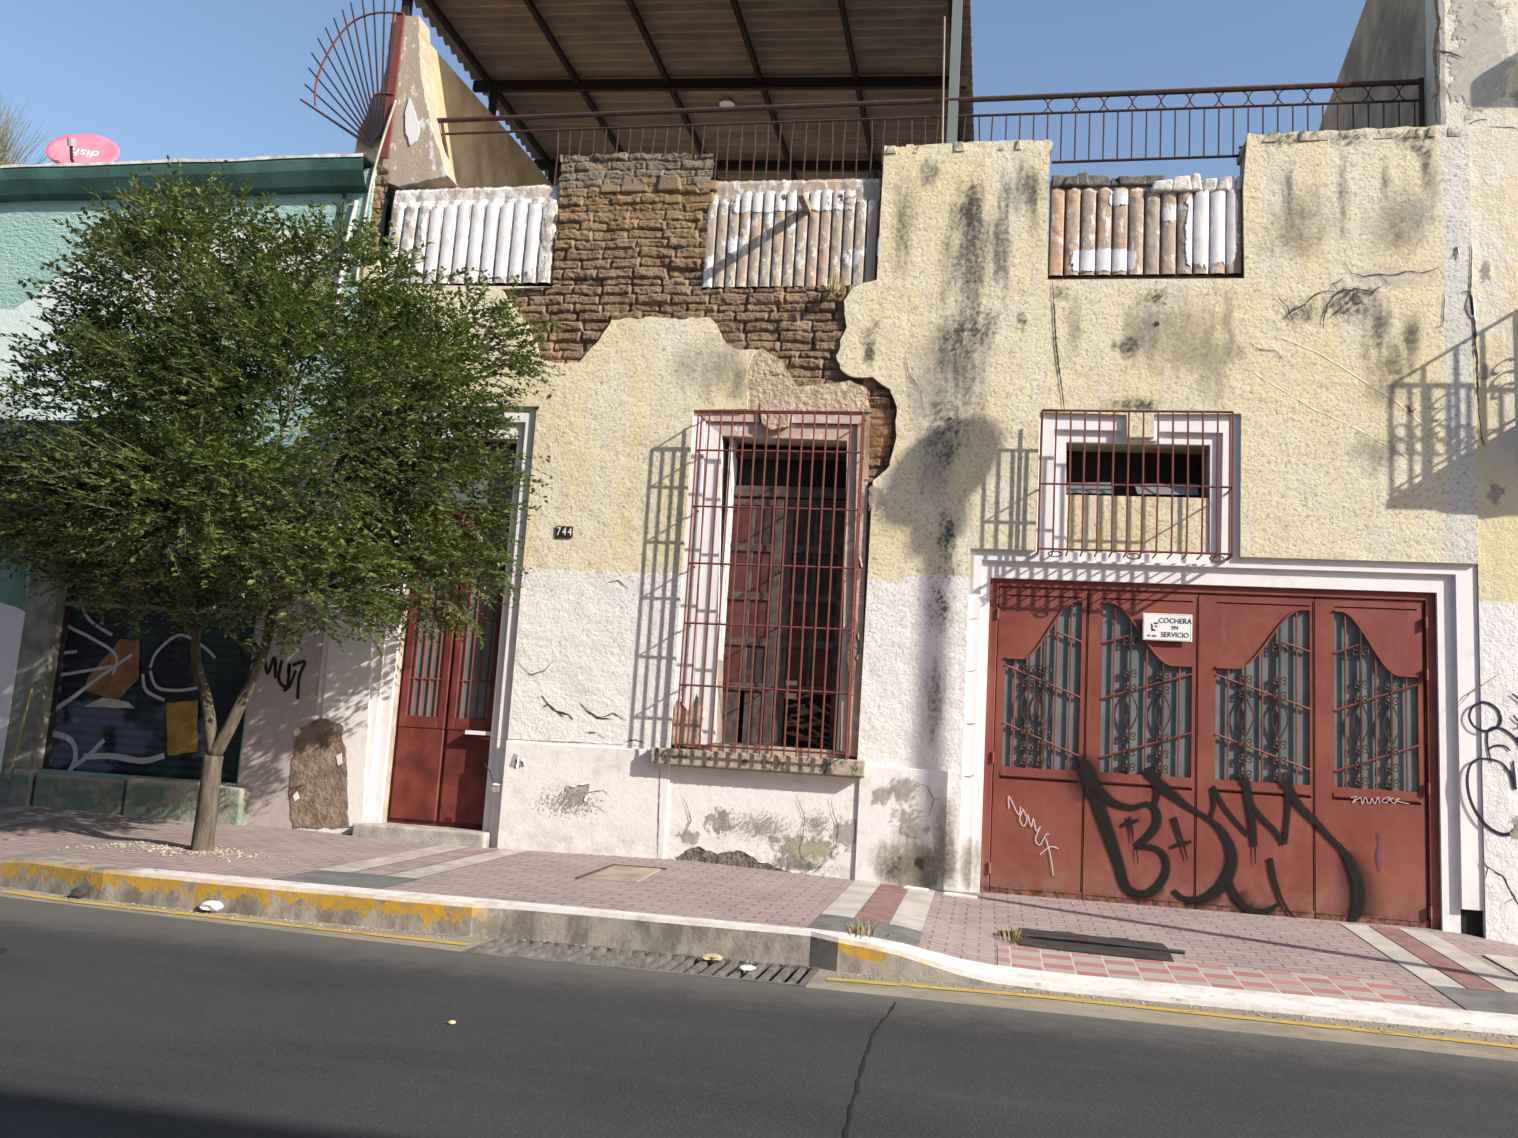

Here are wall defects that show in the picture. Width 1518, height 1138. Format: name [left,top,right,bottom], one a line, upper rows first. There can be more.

peeling [1448,0,1518,121]
leakage [1396,132,1430,174]
leakage [897,199,909,251]
spalling [411,152,897,516]
leakage [928,167,1037,465]
crack [1252,246,1486,446]
leakage [1333,288,1419,379]
crack [482,661,644,782]
peeling [529,782,603,821]
peeling [676,806,857,873]
leakage [878,802,980,886]